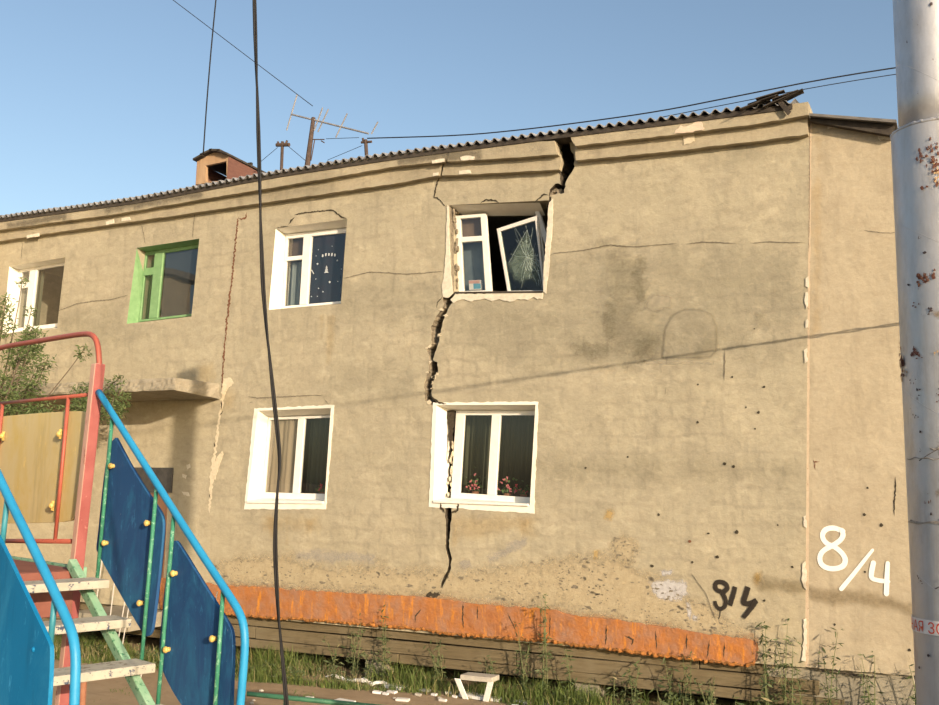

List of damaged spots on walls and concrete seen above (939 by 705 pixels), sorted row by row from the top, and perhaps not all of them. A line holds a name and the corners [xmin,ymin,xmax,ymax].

crack [535,131,575,208]
corrosion [916,137,939,190]
crack [58,295,127,311]
crack [221,212,247,387]
crack [550,241,732,256]
corrosion [907,268,936,287]
spalling [0,382,89,397]
spalling [103,377,234,512]
crack [415,503,459,621]
flaking render [214,554,743,638]